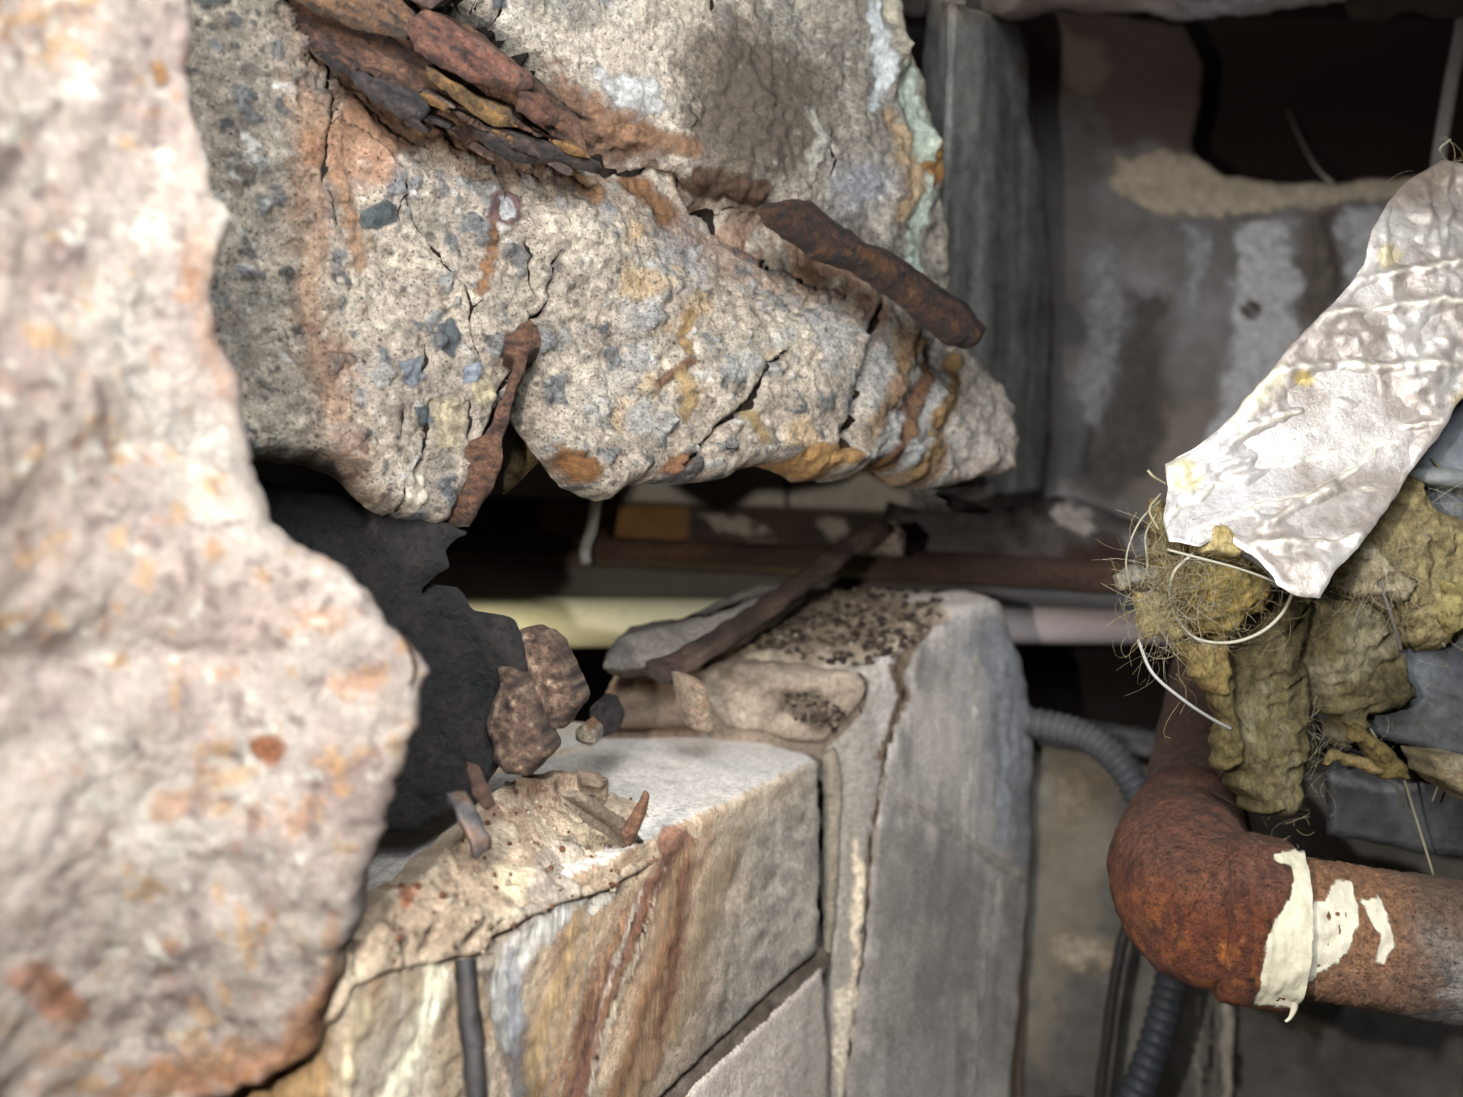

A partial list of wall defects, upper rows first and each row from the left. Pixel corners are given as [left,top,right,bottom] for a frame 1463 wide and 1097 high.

peeling [295,0,534,92]
rust [340,82,494,165]
flaking render [359,200,397,229]
crack [590,154,738,236]
rust [538,60,987,484]
crack [759,259,824,289]
spalling [414,317,497,450]
crack [685,346,792,464]
crack [839,300,883,447]
spalling [394,471,428,519]
rust [646,520,887,685]
rust [523,833,737,1097]